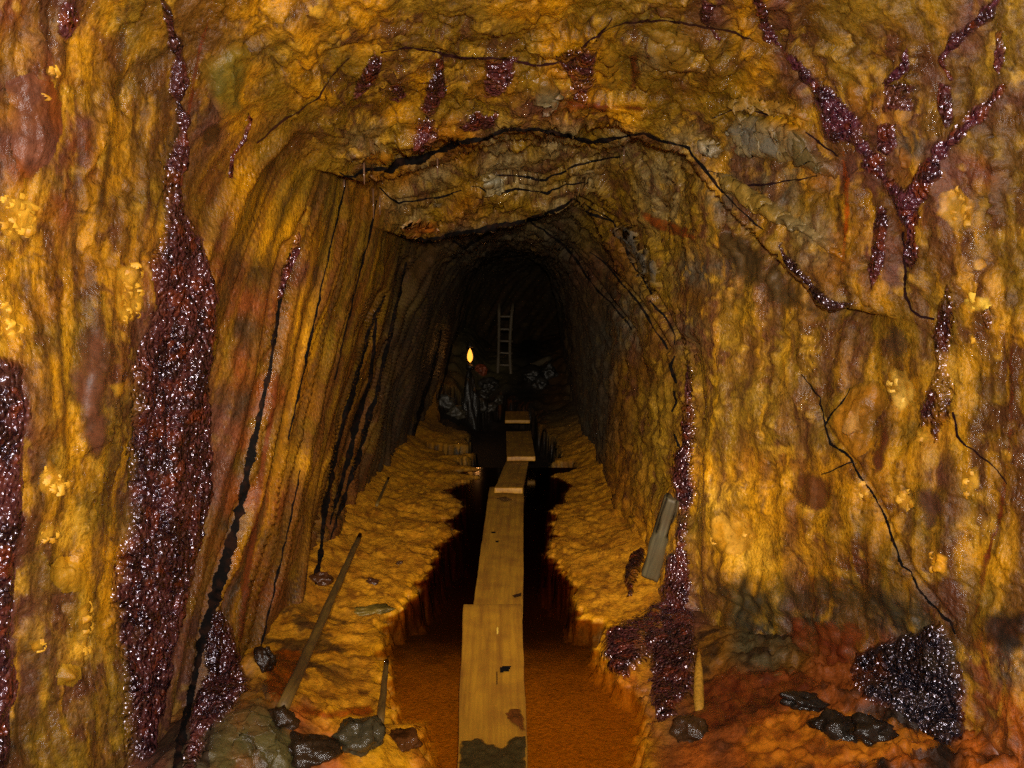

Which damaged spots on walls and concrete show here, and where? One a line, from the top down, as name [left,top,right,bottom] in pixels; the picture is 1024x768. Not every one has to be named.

crack [380,46,558,86]
crack [581,18,754,49]
crack [806,132,838,157]
crack [288,127,817,584]
crack [901,231,935,320]
crack [173,297,283,768]
crack [260,470,301,646]
crack [801,374,956,635]